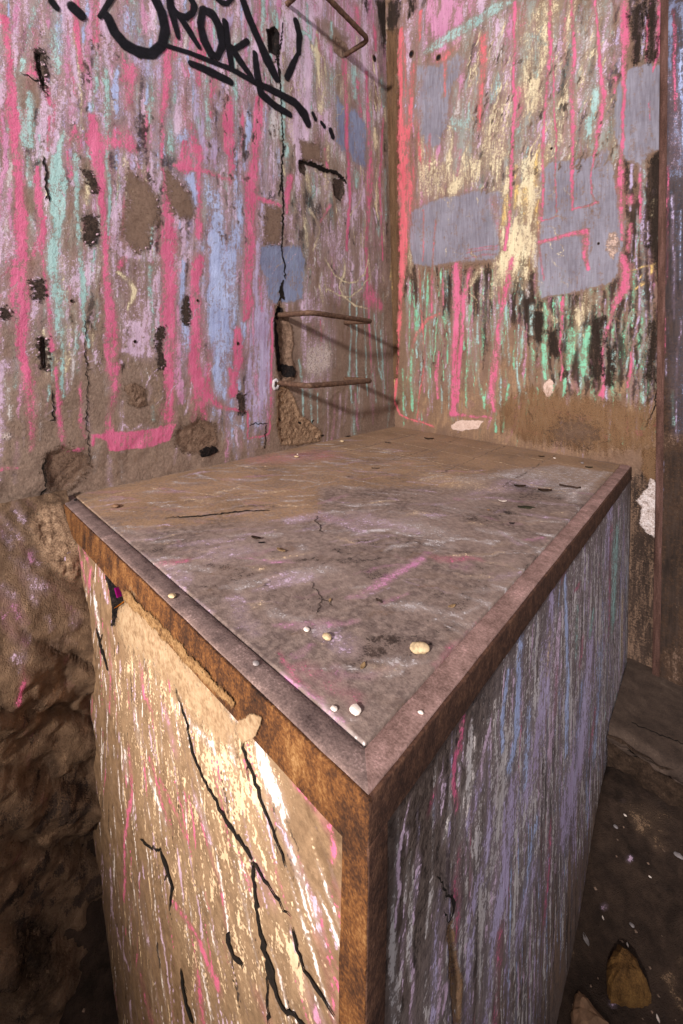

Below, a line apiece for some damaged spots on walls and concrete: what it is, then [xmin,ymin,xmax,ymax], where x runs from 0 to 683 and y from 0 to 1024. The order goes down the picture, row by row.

crack [274,22,347,305]
peeling [119,165,196,255]
flaking render [174,418,218,455]
flaking render [276,387,322,446]
spalling [24,442,92,588]
crack [168,510,265,518]
crack [140,839,173,910]
crack [174,685,334,1024]